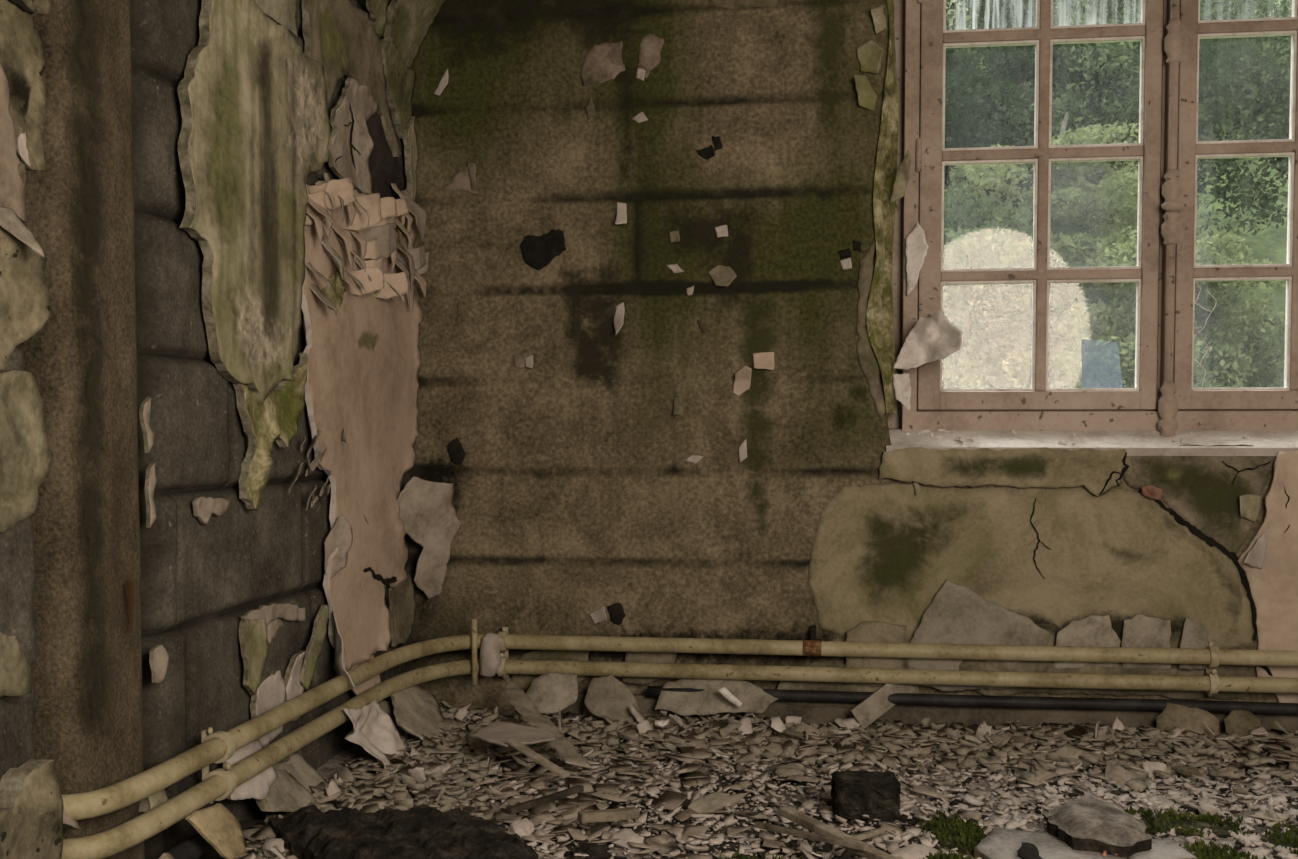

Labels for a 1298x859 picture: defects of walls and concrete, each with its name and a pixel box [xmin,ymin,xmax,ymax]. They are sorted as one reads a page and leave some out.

peeling [0,0,54,532]
water stain [238,193,283,365]
peeling [177,0,461,719]
water stain [569,276,616,380]
water stain [680,219,745,293]
peeling [733,352,775,396]
flaking render [838,0,962,417]
peeling [879,447,1298,703]
crack [1099,452,1273,676]
peeling [0,632,32,697]
peeling [0,759,64,859]
peeling [343,700,407,769]